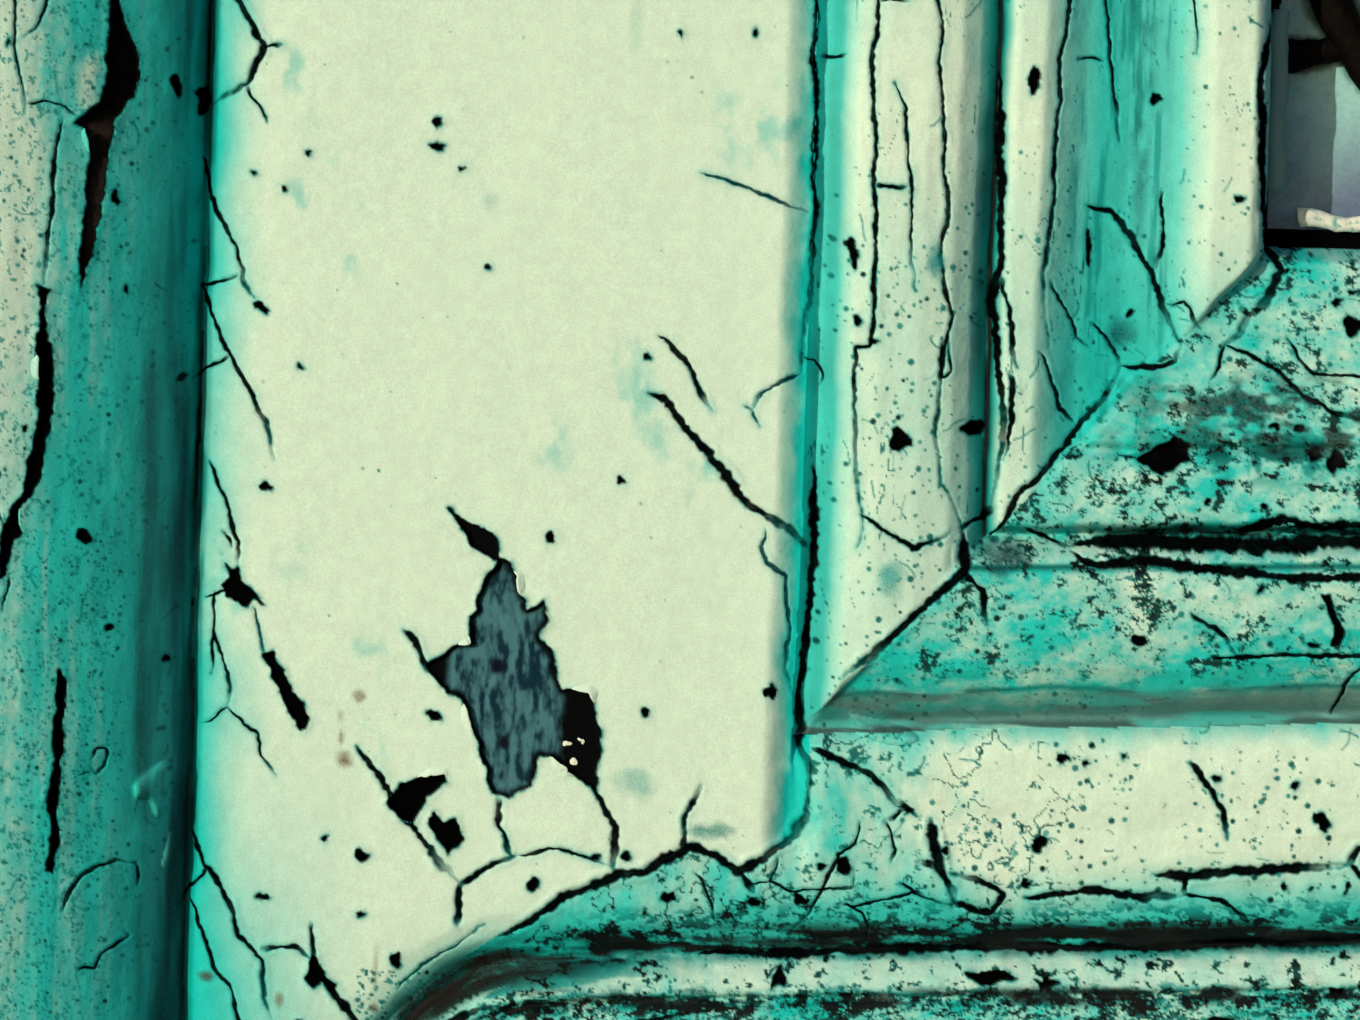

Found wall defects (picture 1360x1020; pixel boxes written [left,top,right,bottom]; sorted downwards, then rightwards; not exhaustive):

peeling [74,0,140,286]
crack [204,0,278,118]
crack [703,0,954,454]
crack [1042,0,1177,370]
crack [861,73,1360,660]
spalling [1137,437,1190,475]
crack [1242,25,1290,316]
peeling [426,507,602,798]
crack [357,336,1360,987]
crack [182,829,358,1020]
spalling [387,768,464,854]
crack [450,1007,484,1020]